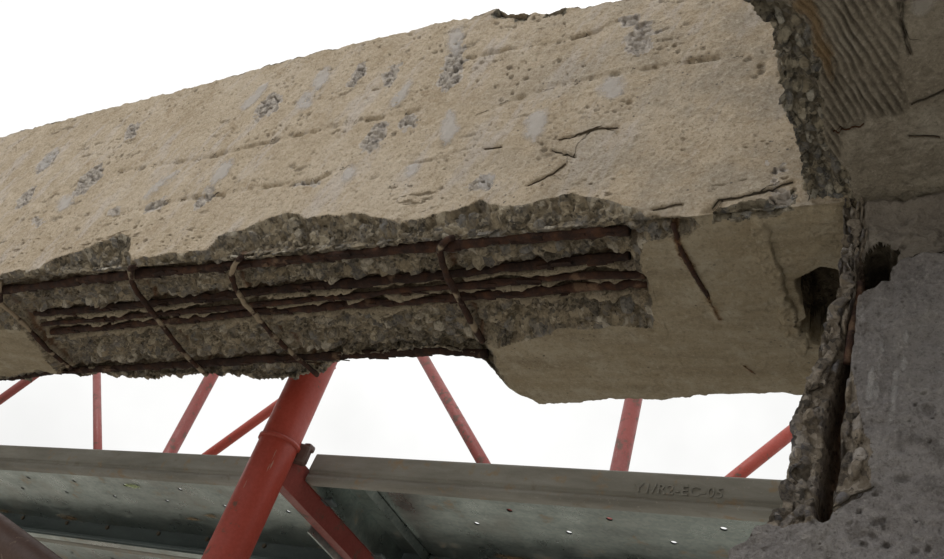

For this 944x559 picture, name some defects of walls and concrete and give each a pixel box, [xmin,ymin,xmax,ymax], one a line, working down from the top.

crack [900,4,921,55]
crack [911,90,944,105]
crack [528,126,618,186]
crack [909,132,940,140]
crack [712,181,793,212]
spalling [0,193,701,386]
corrosion [670,217,722,320]
spalling [712,0,901,528]
crack [831,486,874,515]